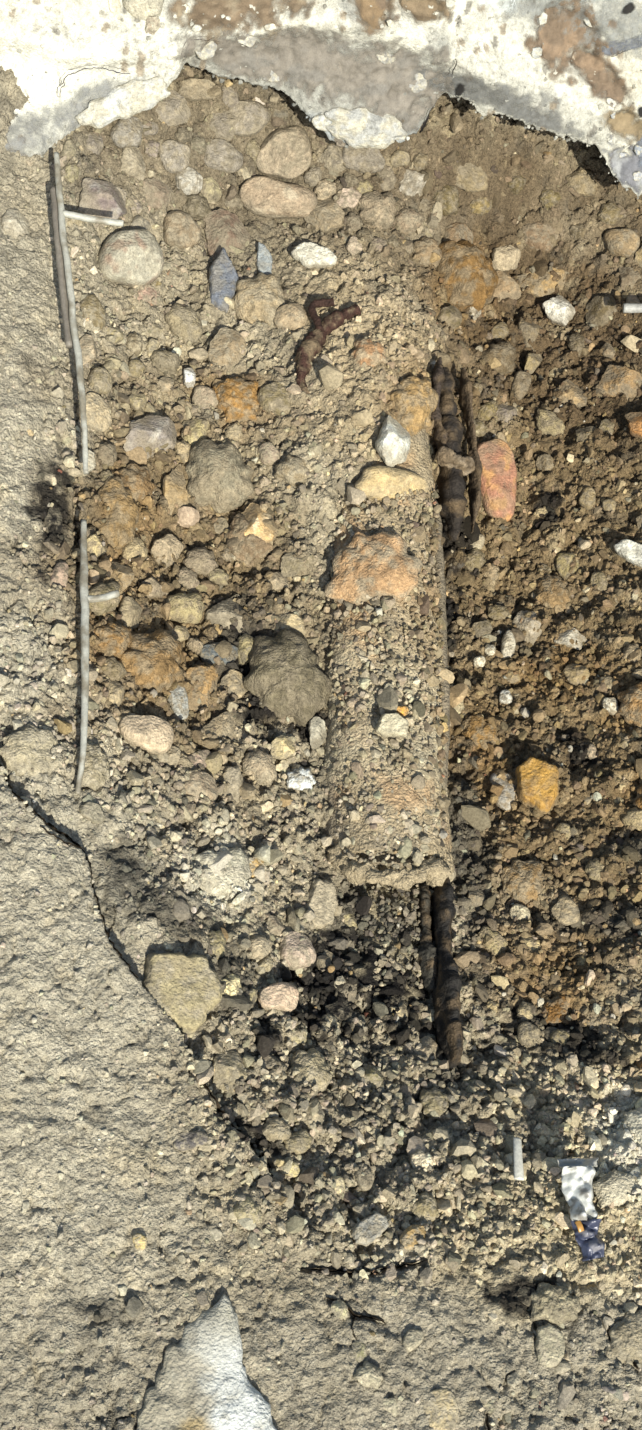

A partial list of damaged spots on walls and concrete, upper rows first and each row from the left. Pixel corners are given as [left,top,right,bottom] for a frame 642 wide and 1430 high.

crack [0,765,138,979]
crack [181,1031,273,1176]